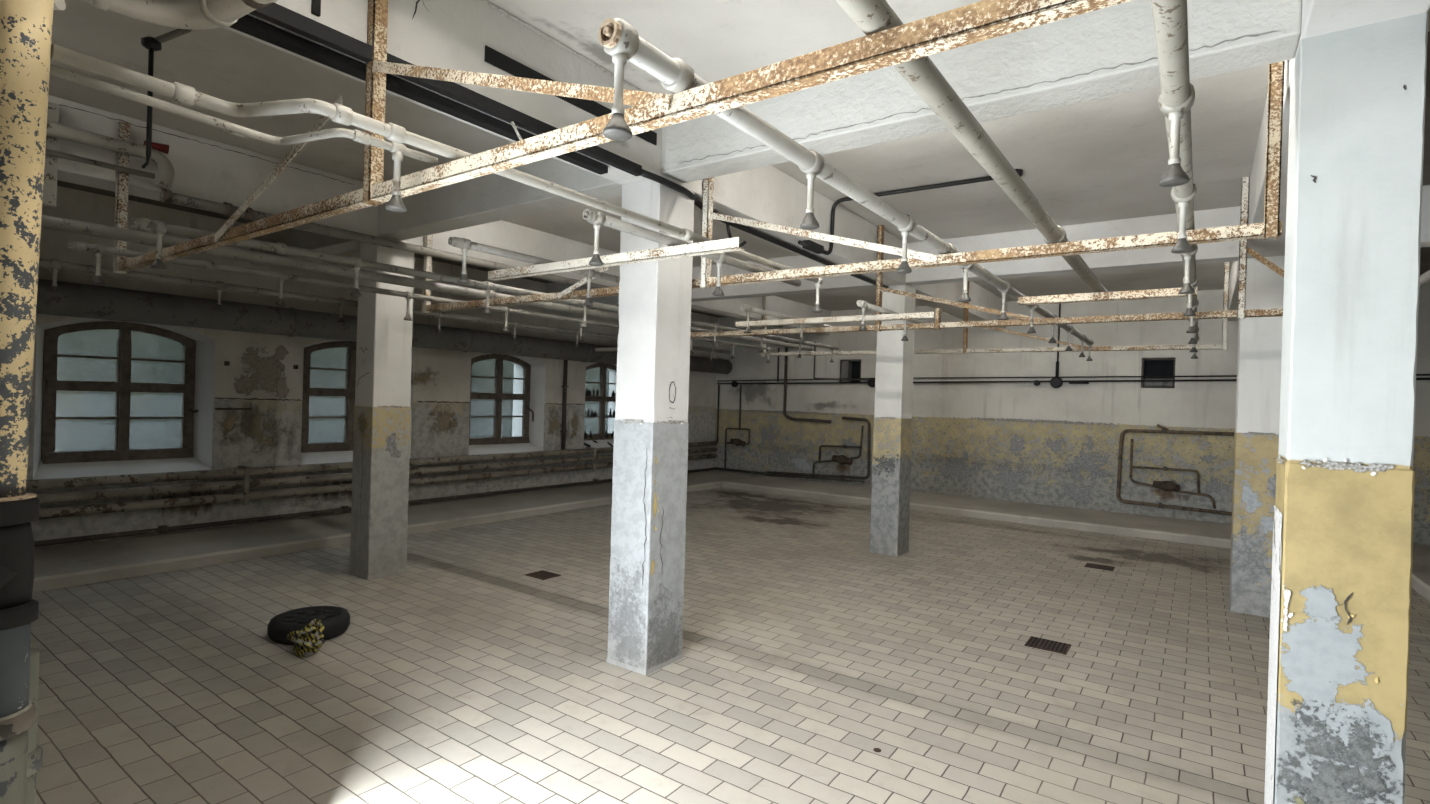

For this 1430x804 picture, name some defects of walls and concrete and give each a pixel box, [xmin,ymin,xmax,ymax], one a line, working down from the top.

peeling [234,340,292,401]
water stain [1076,548,1220,572]
peeling [1199,455,1405,804]
crack [1337,592,1353,625]